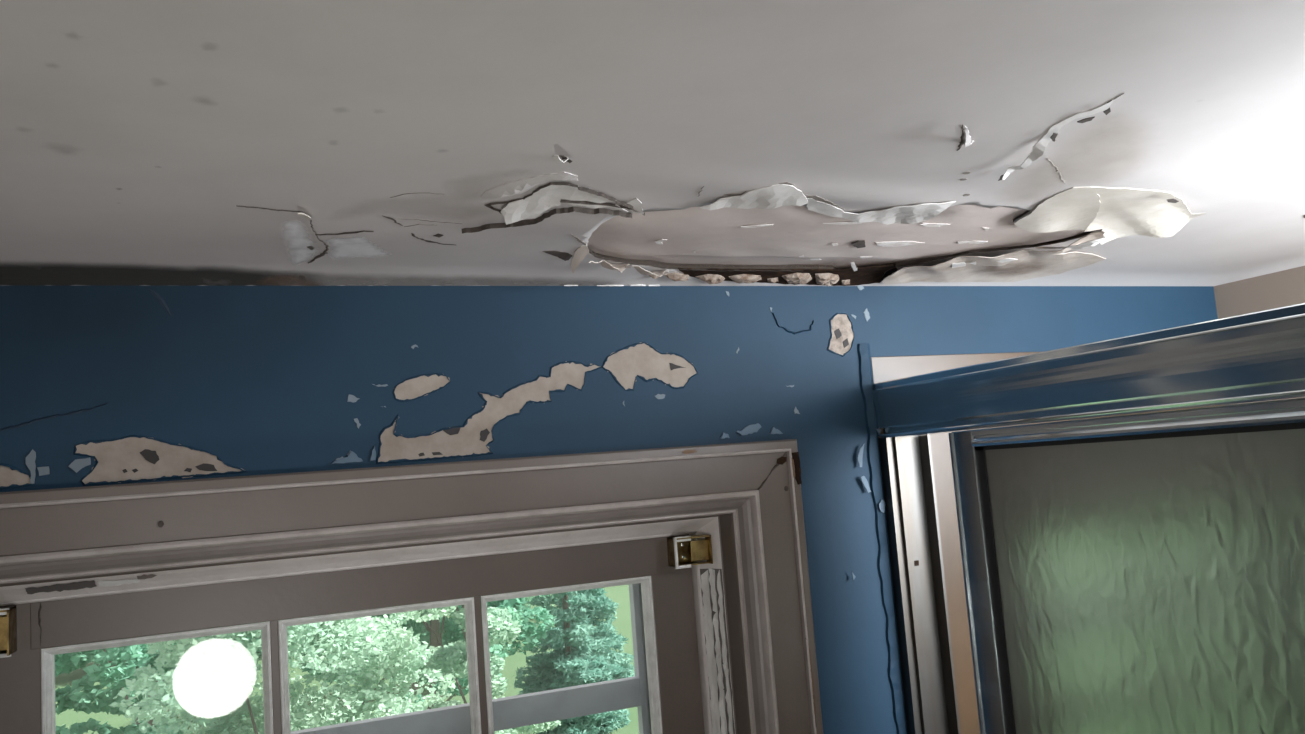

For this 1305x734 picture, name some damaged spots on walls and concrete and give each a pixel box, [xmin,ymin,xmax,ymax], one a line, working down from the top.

flaking render [542,182,1106,296]
peeling [827,308,870,357]
peeling [347,394,361,429]
peeling [373,342,698,464]
peeling [0,449,50,491]
peeling [68,435,247,486]